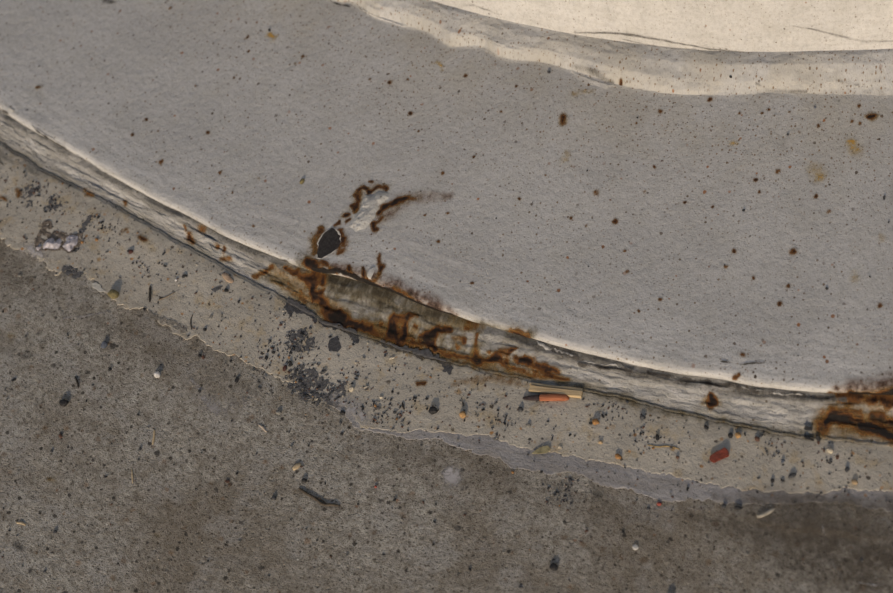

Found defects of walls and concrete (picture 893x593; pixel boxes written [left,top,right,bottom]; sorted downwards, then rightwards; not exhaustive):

spalling [34,196,92,253]
peeling [311,226,348,259]
corrosion [333,180,416,233]
corrosion [252,253,569,386]
peeling [283,298,359,408]
corrosion [705,392,719,410]
corrosion [813,379,893,444]